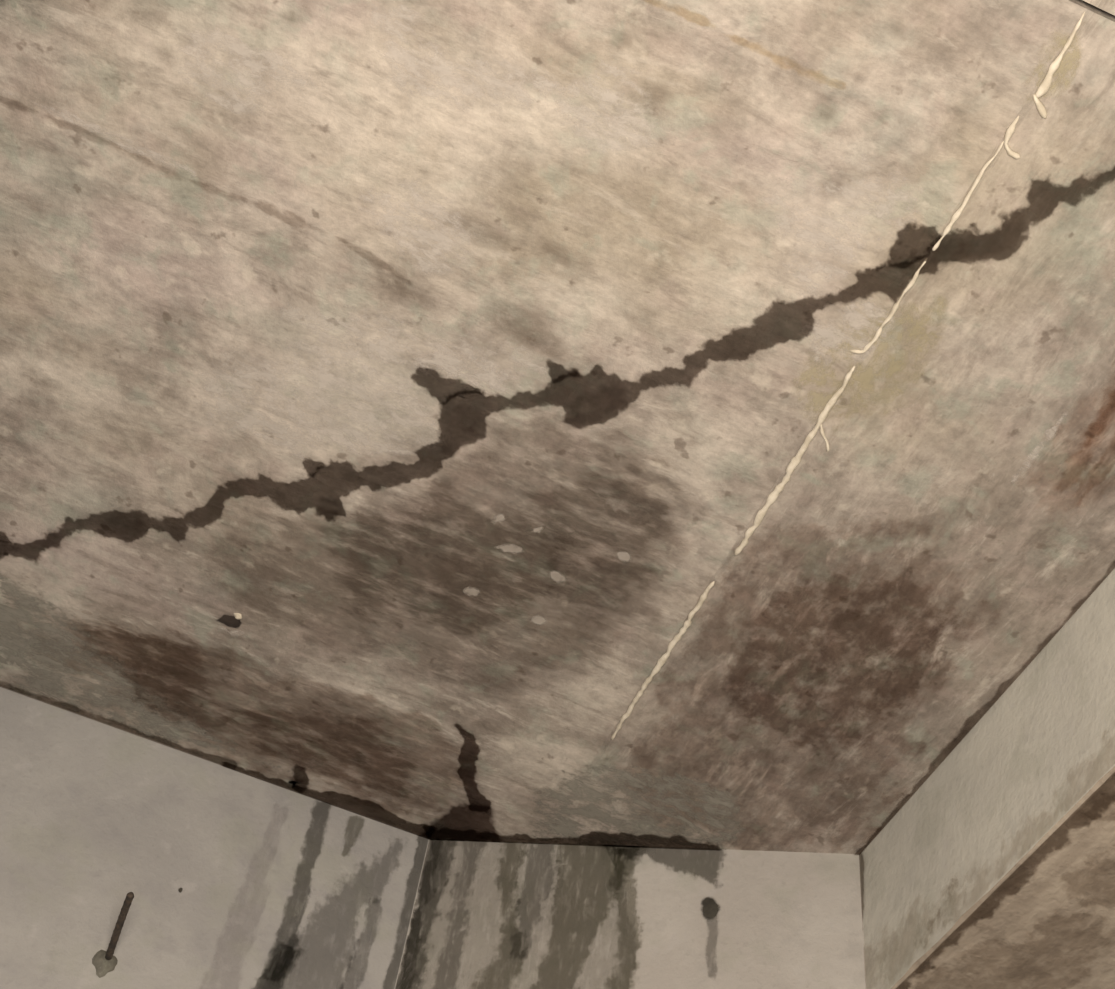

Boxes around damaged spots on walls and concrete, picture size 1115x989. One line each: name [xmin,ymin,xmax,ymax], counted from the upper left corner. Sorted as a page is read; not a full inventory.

crack [0,168,1115,561]
crack [223,724,720,851]